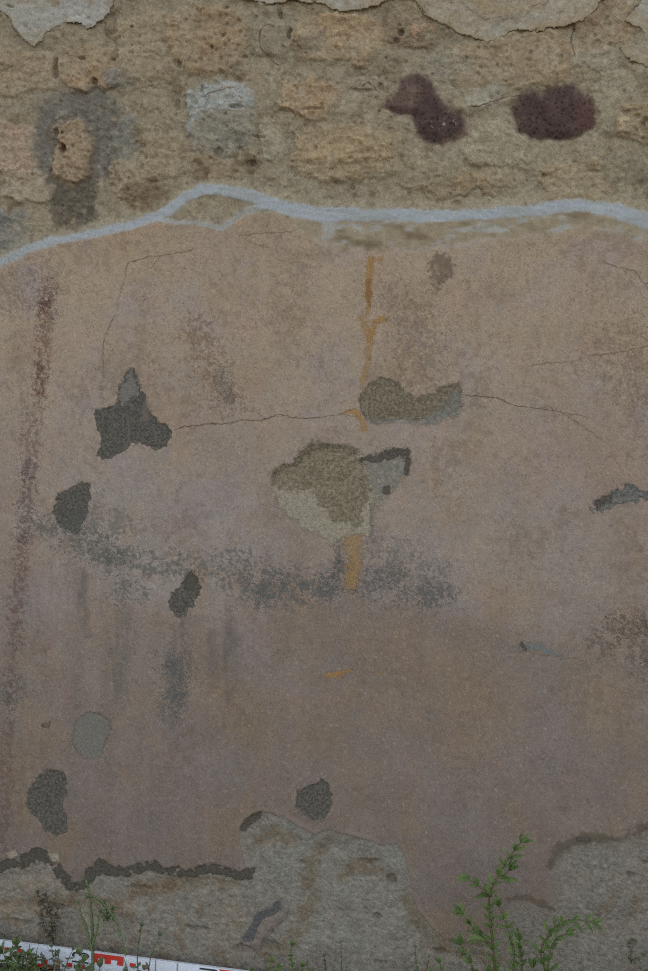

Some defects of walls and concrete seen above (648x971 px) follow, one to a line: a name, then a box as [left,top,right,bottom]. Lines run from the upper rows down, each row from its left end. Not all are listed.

flaking render [0,0,648,259]
spalling [345,315,462,430]
spalling [94,367,172,460]
crack [175,408,358,430]
crack [462,394,605,442]
spalling [53,481,92,534]
spalling [271,440,411,594]
spalling [168,569,202,618]
spalling [25,770,67,837]
spalling [240,811,262,831]
spalling [296,779,332,821]
spalling [0,847,255,892]